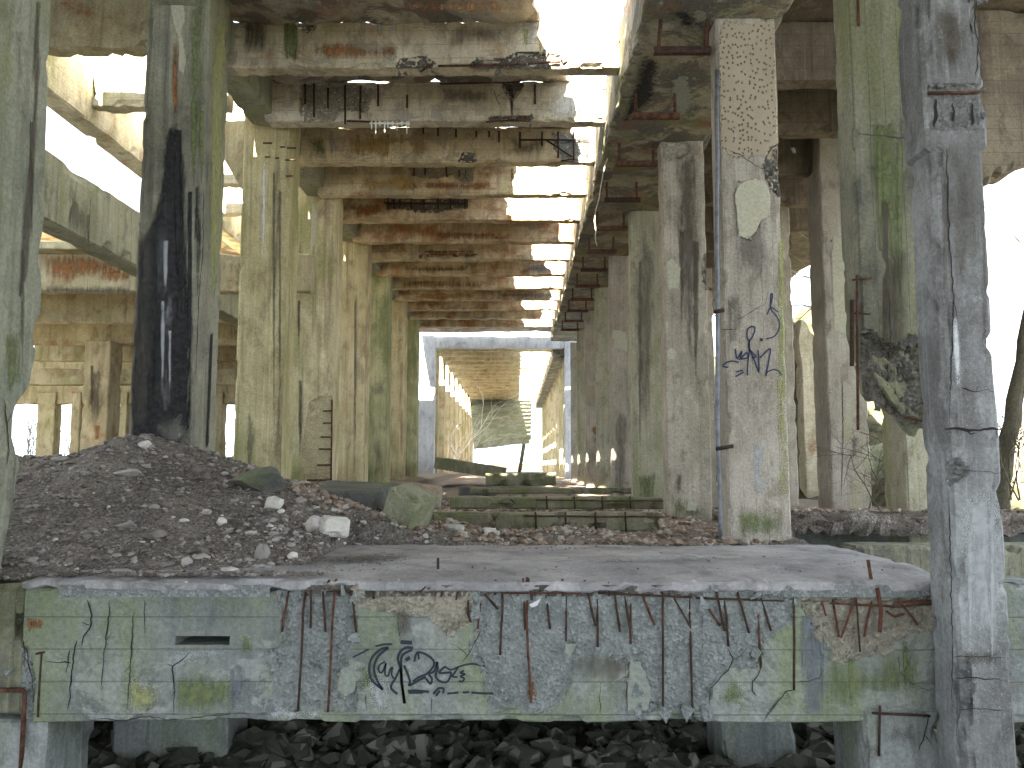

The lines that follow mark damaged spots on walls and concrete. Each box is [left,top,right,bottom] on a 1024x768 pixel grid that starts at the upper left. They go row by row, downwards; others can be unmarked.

corrosion [315,43,394,57]
spalling [396,49,594,163]
peeling [719,20,796,241]
corrosion [48,256,129,281]
leakage [140,63,216,411]
spalling [831,236,923,430]
leakage [877,124,903,383]
crack [945,150,1001,438]
crack [22,600,244,721]
spalling [59,577,938,768]
crack [709,649,824,720]